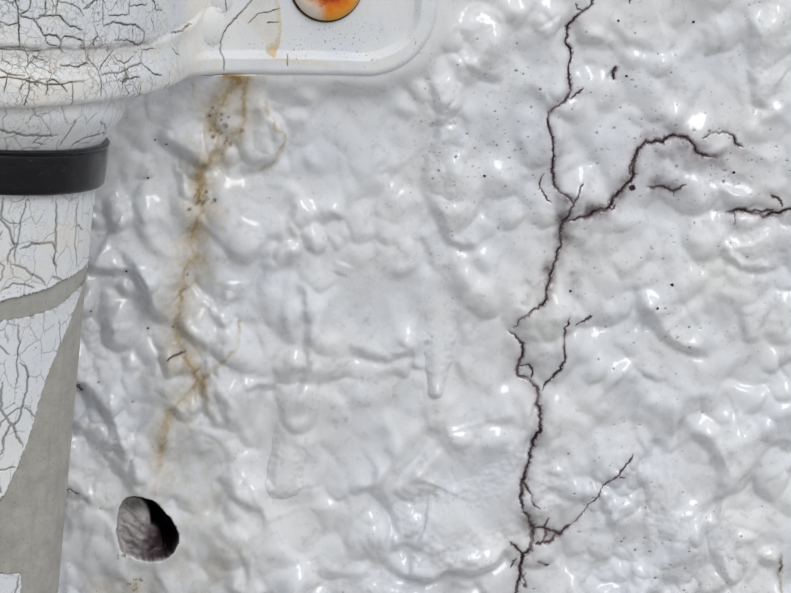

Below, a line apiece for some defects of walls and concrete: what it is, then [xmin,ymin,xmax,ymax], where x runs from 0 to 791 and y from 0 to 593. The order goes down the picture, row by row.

crack [0,0,163,105]
crack [220,0,277,64]
corrosion [292,0,360,23]
crack [727,195,791,225]
crack [508,0,742,593]
spalling [115,496,179,563]